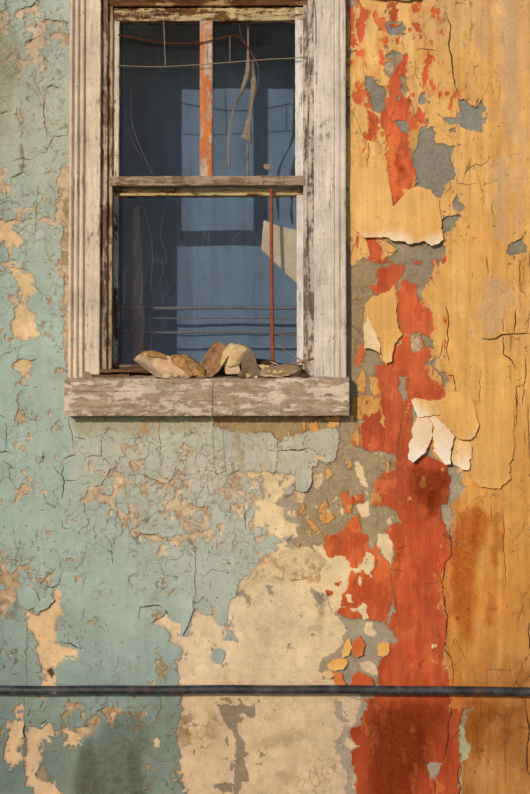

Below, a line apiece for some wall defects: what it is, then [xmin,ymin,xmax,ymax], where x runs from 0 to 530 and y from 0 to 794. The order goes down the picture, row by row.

crack [37,92,68,155]
peeling [0,215,38,248]
peeling [56,165,69,373]
peeling [507,233,527,256]
peeling [8,264,41,379]
peeling [149,0,515,794]
crack [483,310,530,450]
crack [40,451,76,499]
crack [68,418,118,466]
peeling [83,465,214,543]
crack [131,417,176,485]
peeling [0,556,79,686]